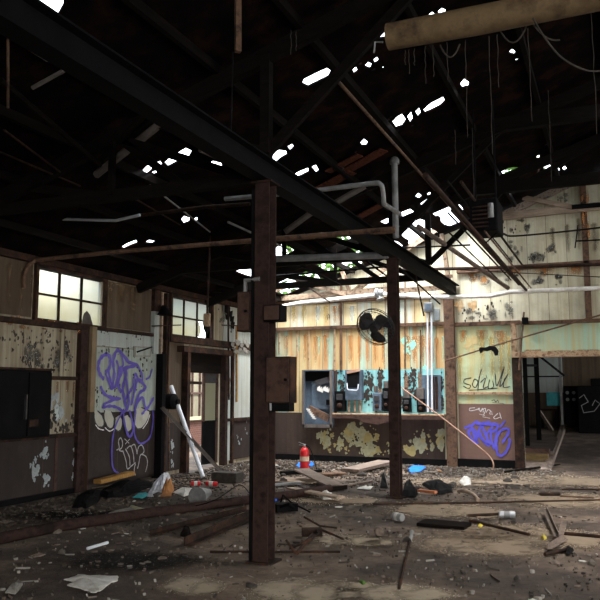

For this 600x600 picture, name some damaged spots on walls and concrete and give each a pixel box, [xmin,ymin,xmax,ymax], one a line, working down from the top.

damp [530,228,556,263]
damp [466,308,496,320]
peeling [0,330,73,373]
rust [349,336,384,360]
peeling [364,367,385,412]
peeling [50,392,74,434]
peeling [316,421,389,457]
peeling [29,440,51,487]